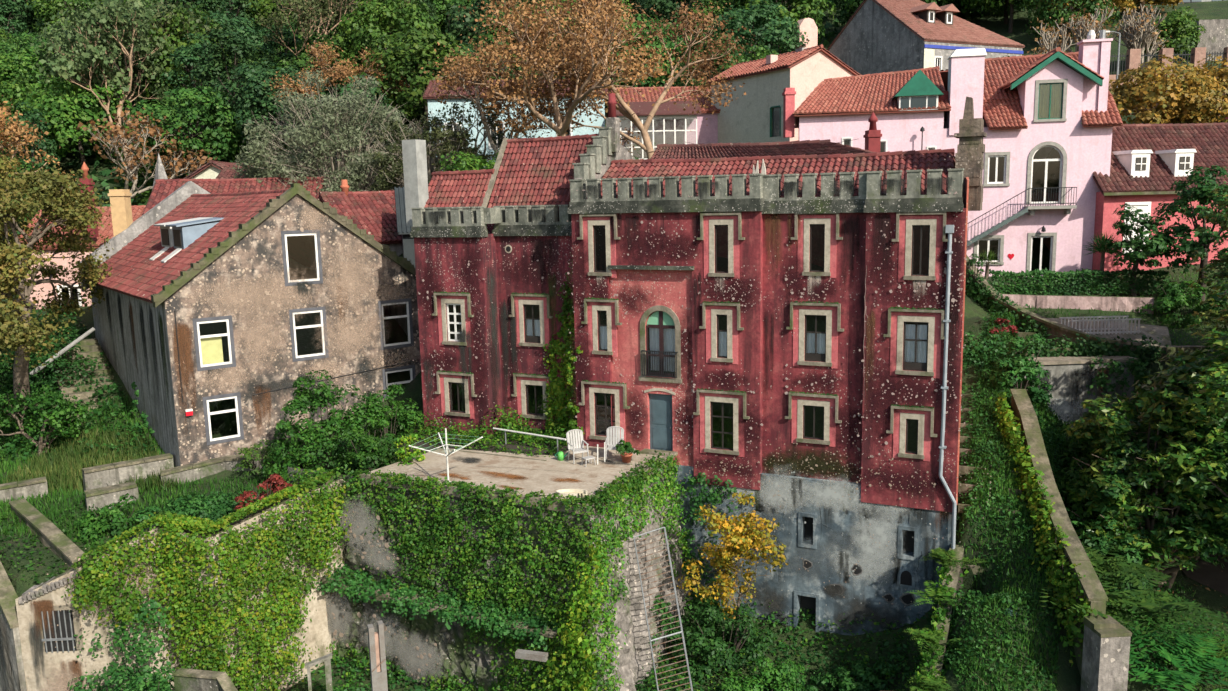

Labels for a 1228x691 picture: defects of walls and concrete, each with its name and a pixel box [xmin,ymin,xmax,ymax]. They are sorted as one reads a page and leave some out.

leakage [106,291,195,396]
peeling [501,199,991,604]
leakage [1070,368,1109,404]
leakage [791,533,902,630]
spalling [879,589,916,610]